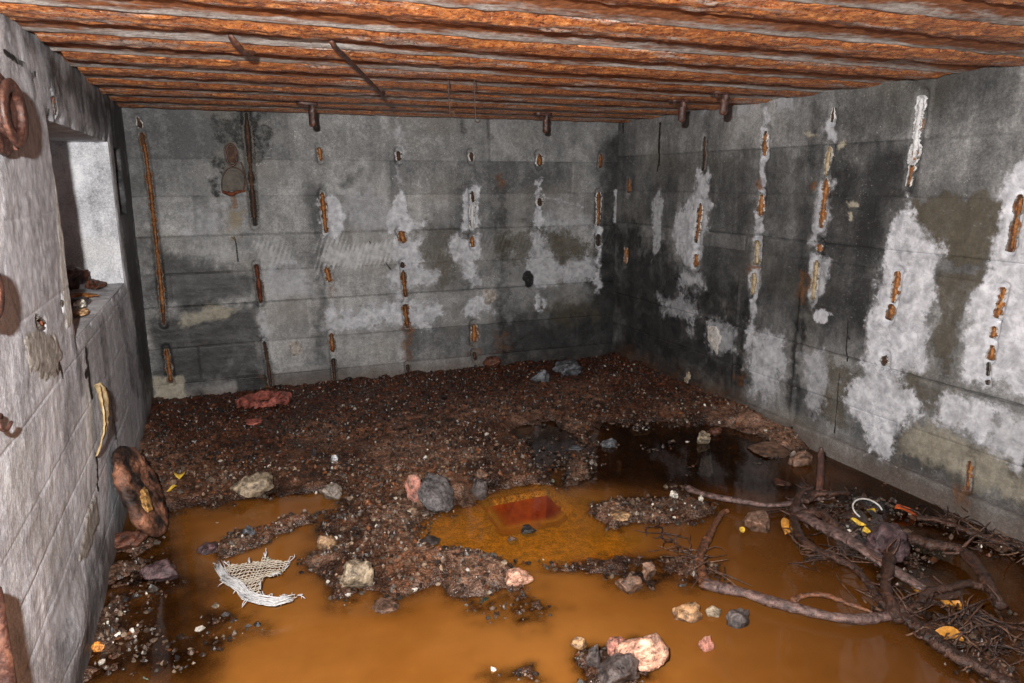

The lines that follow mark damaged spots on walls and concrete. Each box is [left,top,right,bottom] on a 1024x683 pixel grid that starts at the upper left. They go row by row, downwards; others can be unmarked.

spalling [241,112,259,226]
leakage [757,107,771,194]
leakage [825,118,845,150]
spalling [905,95,928,187]
leakage [311,191,443,331]
spalling [400,262,411,328]
leakage [448,185,496,318]
leakage [503,139,835,408]
spalling [885,271,901,320]
leakage [843,160,1024,472]
spalling [985,287,1008,385]
spalling [1005,194,1024,252]